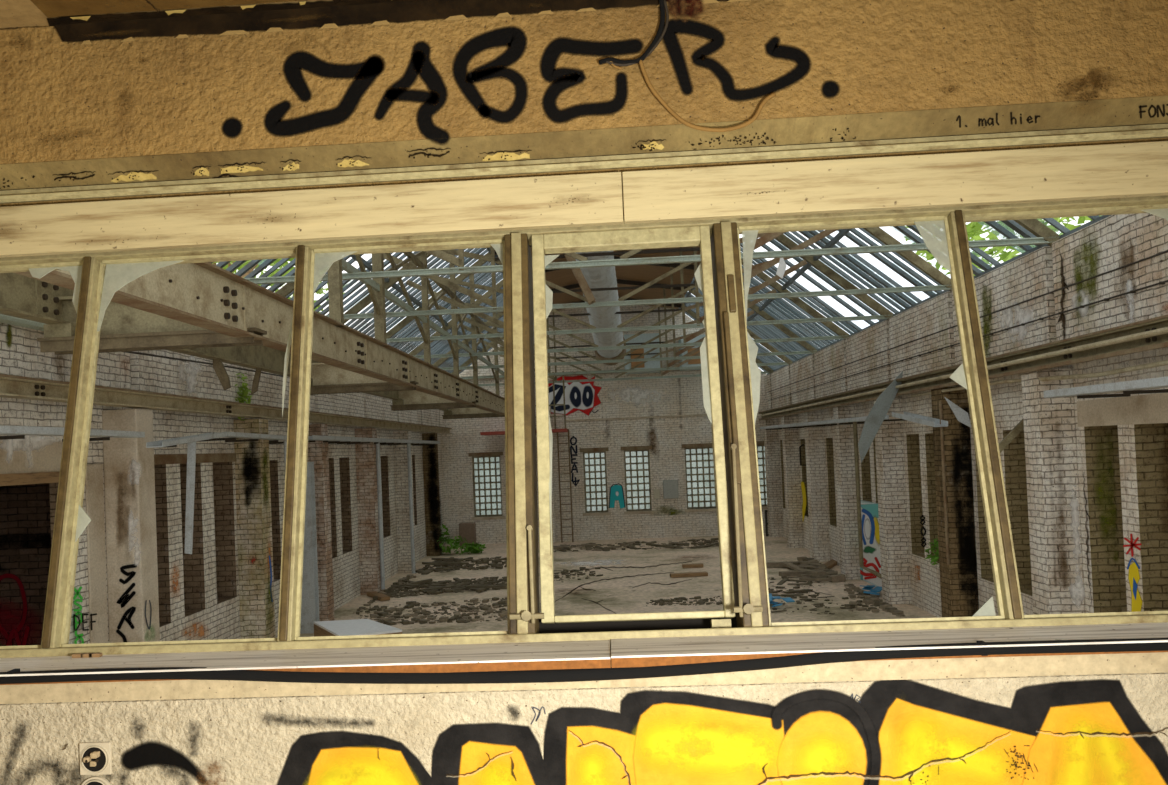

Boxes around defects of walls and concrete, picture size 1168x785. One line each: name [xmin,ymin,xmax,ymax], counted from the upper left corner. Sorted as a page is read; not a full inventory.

peeling [408,148,450,158]
peeling [54,170,158,183]
peeling [191,162,266,179]
peeling [280,159,301,171]
peeling [336,156,369,168]
leakage [955,407,978,603]
crack [447,751,512,776]
crack [569,730,631,785]
crack [758,728,1168,785]